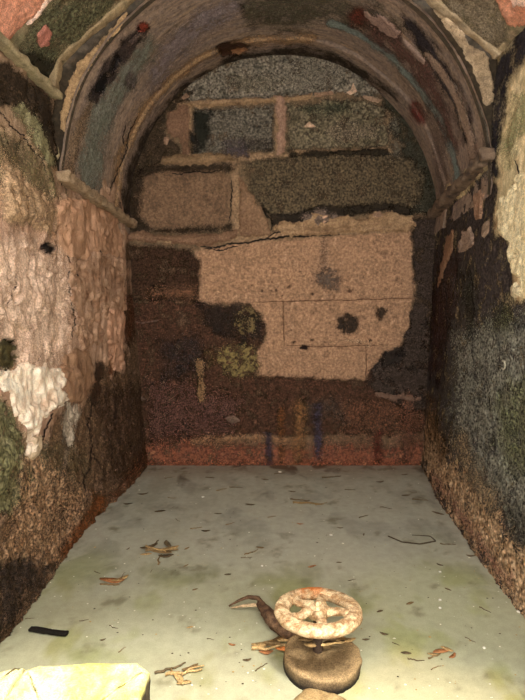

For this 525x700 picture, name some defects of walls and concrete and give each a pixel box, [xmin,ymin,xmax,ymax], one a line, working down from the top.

peeling [433,8,494,106]
peeling [0,177,421,460]
water stain [0,180,525,643]
crack [200,209,340,251]